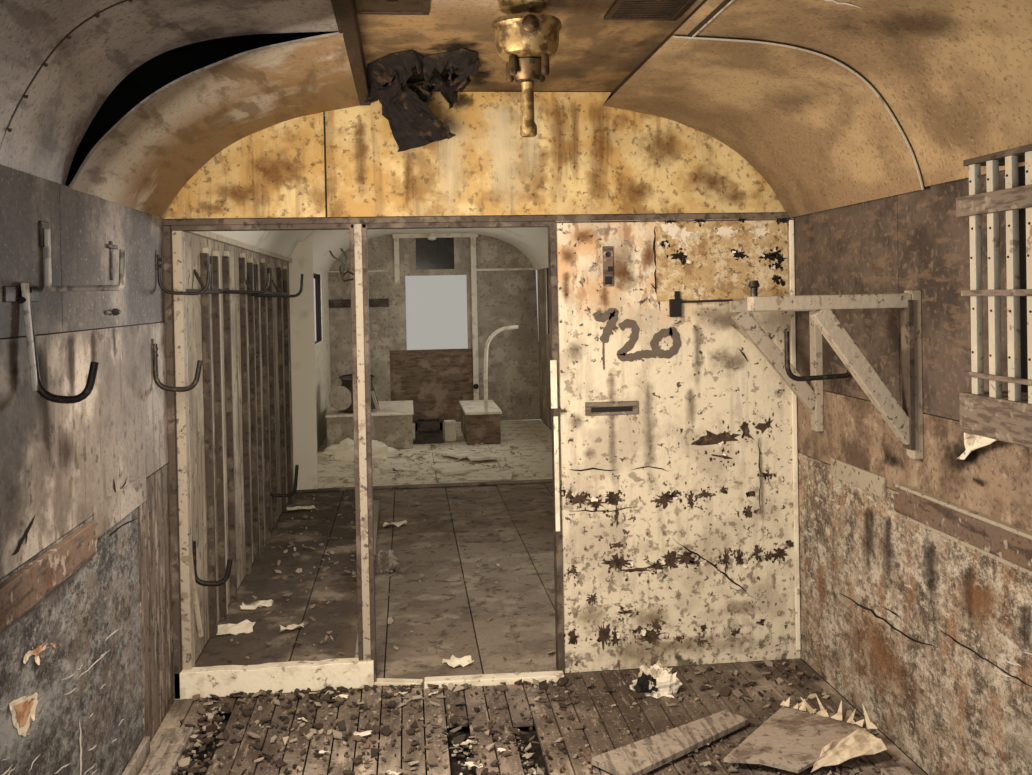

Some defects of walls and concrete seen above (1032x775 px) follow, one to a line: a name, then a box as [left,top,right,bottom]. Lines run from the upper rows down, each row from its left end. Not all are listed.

corrosion [260,161,294,183]
corrosion [356,124,367,182]
corrosion [556,108,576,163]
peeling [656,218,792,286]
peeling [680,413,777,468]
peeling [561,487,626,528]
peeling [655,485,728,509]
peeling [742,491,757,518]
peeling [601,540,794,584]
peeling [564,605,710,650]
crack [840,593,1032,687]
spalling [9,692,38,737]